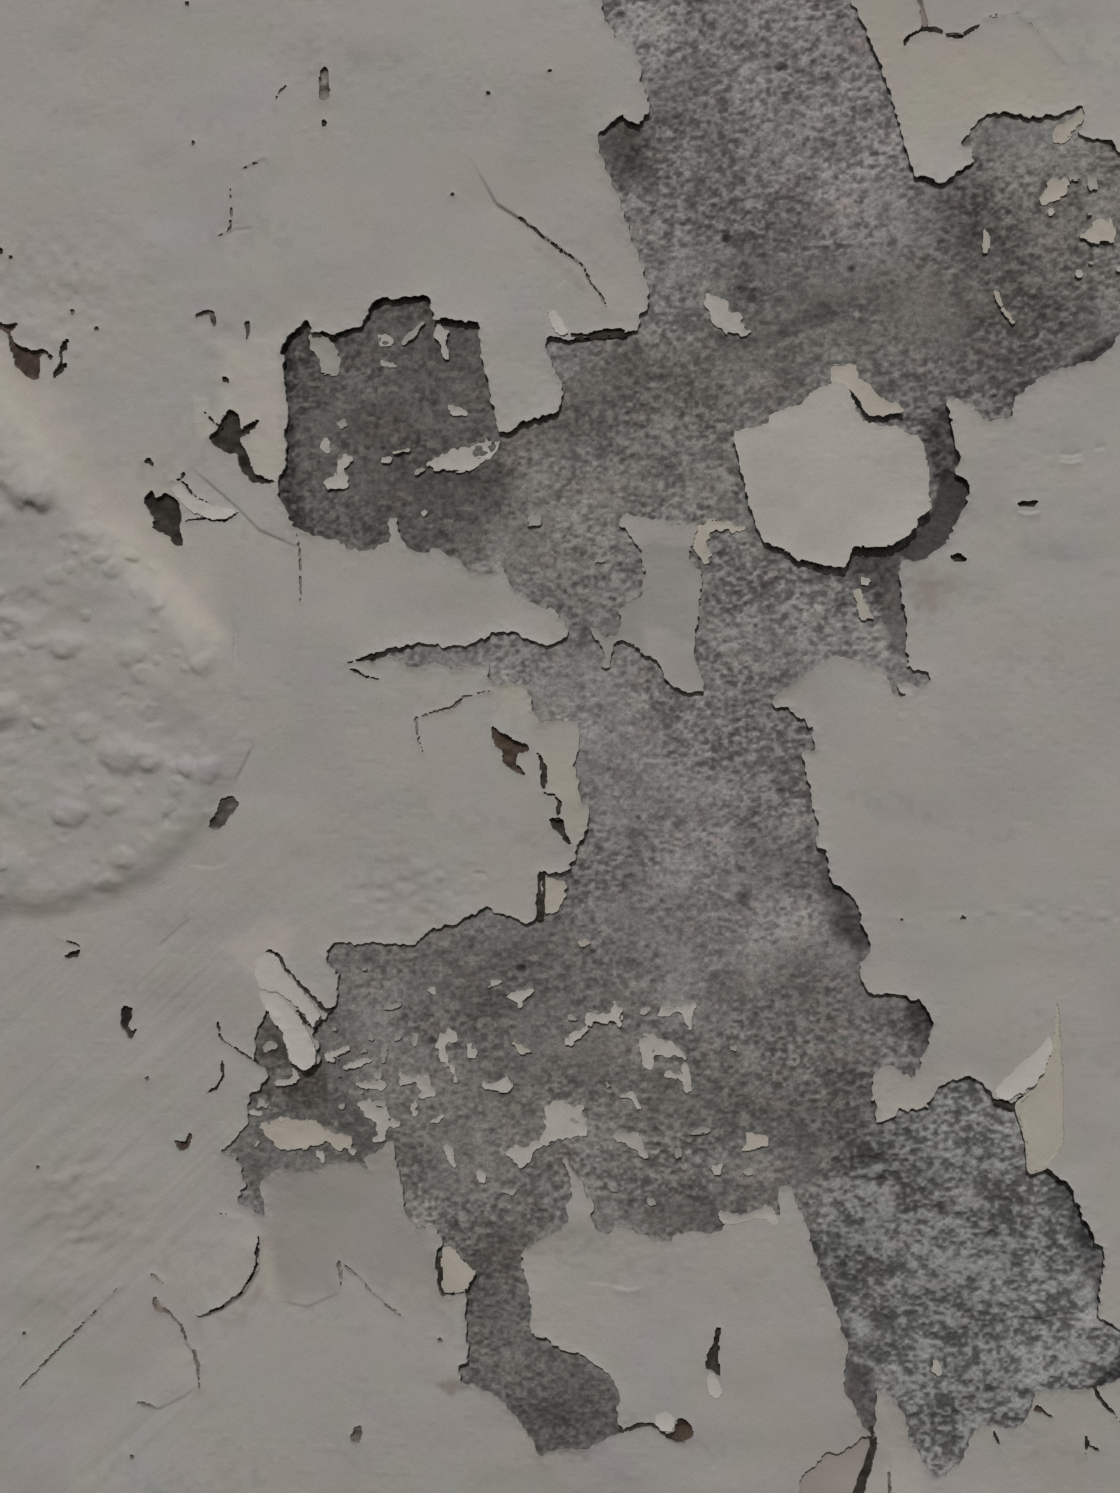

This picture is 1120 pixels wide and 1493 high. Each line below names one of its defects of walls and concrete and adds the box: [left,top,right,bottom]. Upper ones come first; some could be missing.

crack [903,0,1032,46]
crack [518,217,629,341]
peeling [0,323,69,380]
peeling [196,310,216,327]
peeling [210,410,275,484]
peeling [145,485,236,546]
peeling [222,0,1120,1477]
peeling [210,796,239,831]
peeling [183,1214,258,1316]
crack [22,1310,97,1386]
crack [151,1236,260,1388]
crack [852,1426,892,1493]